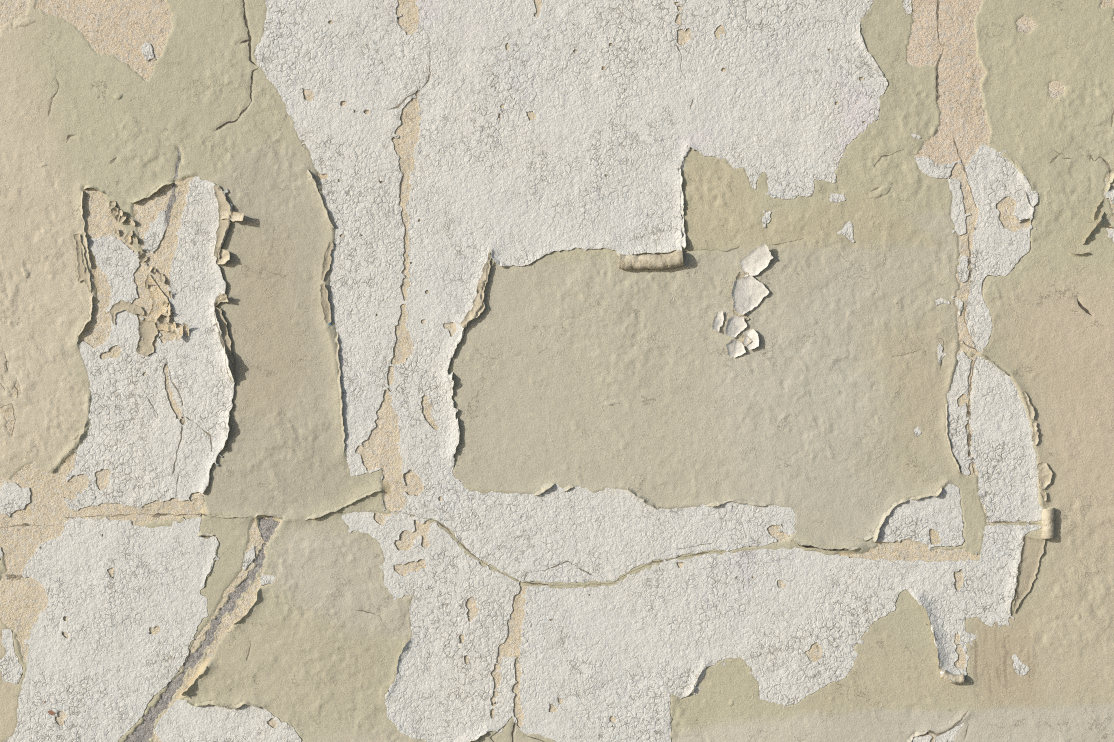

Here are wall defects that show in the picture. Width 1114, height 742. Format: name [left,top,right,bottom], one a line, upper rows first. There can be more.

flaking render [35,0,172,81]
crack [216,0,259,130]
peeling [254,0,1055,742]
peeling [0,176,303,742]
crack [1,359,280,742]
crack [405,513,722,586]
crack [797,543,849,551]